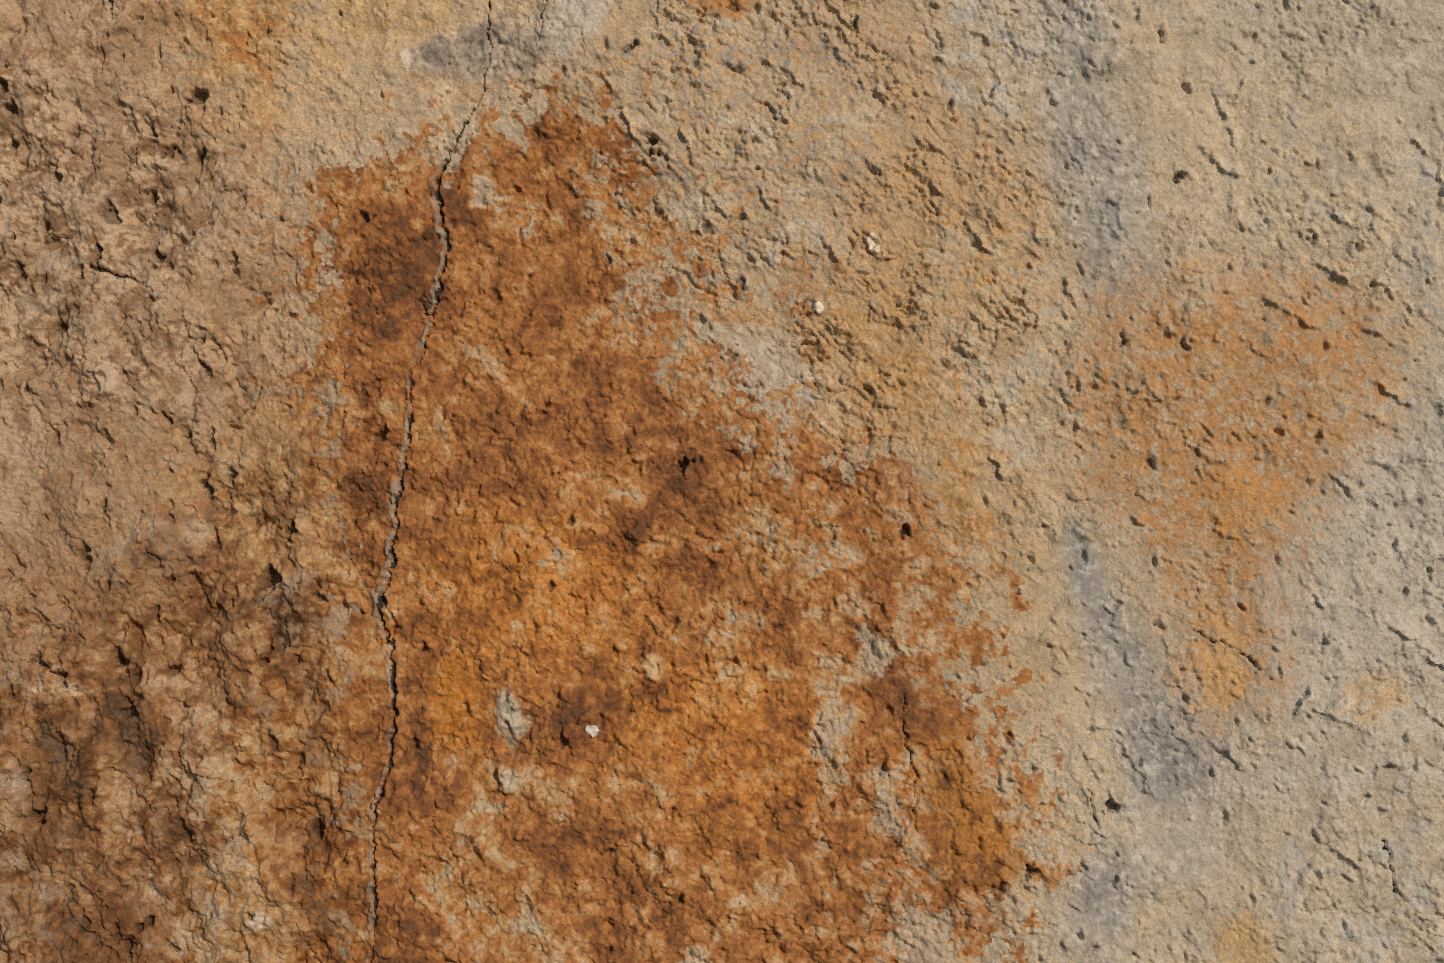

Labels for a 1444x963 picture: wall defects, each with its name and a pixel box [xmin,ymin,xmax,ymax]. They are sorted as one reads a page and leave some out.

rust [509,82,534,105]
crack [365,2,491,963]
rust [282,623,295,636]
rust [1043,748,1076,777]